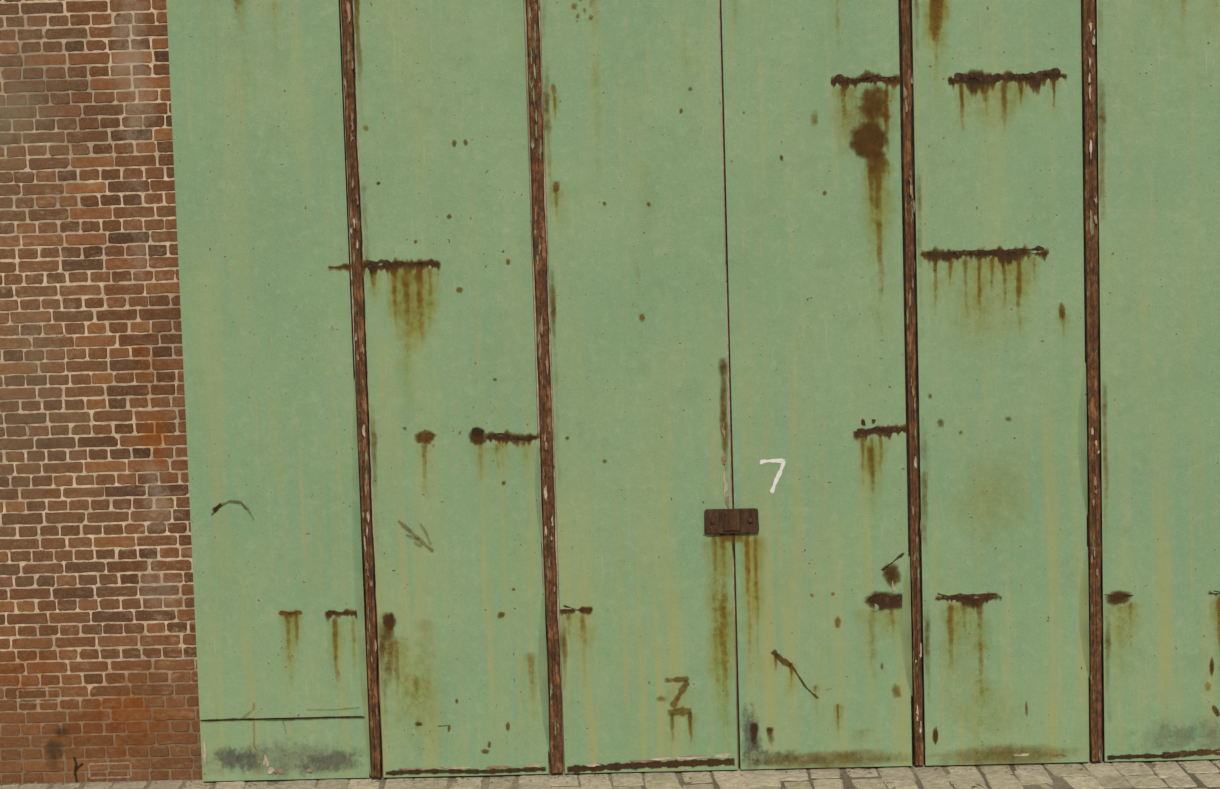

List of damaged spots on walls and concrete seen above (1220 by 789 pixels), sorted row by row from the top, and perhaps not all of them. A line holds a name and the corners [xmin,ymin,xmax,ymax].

corrosion [931,0,942,29]
corrosion [948,68,1066,101]
corrosion [831,73,900,187]
corrosion [330,259,439,281]
corrosion [921,246,1047,282]
corrosion [471,428,540,444]
corrosion [854,419,907,438]
corrosion [936,593,997,607]